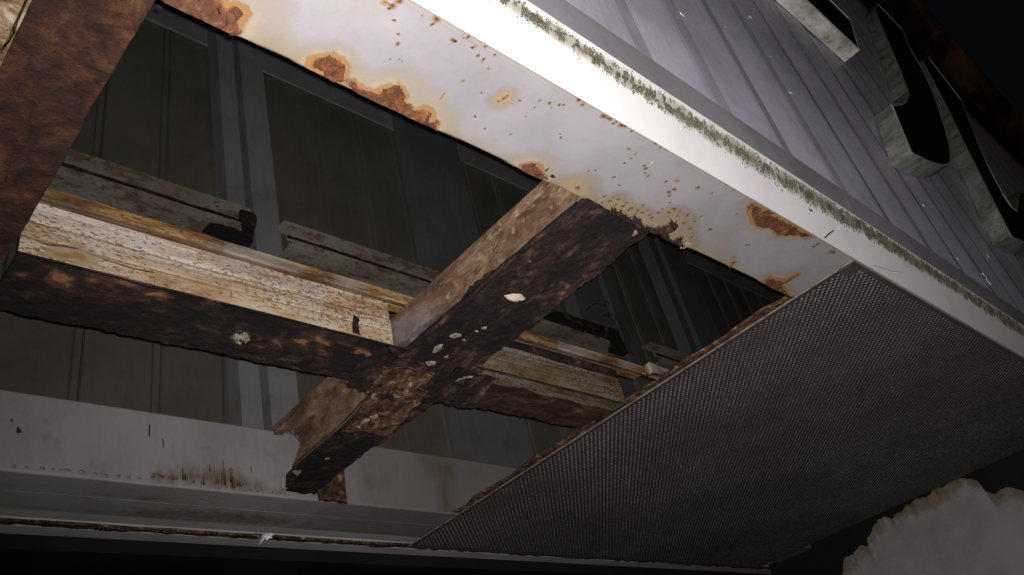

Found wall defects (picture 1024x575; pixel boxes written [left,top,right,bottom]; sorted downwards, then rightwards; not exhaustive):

rust [156,0,274,45]
rust [300,49,446,132]
rust [512,156,597,197]
damp [605,196,693,248]
rust [735,200,836,254]
rust [760,270,804,296]
rust [151,462,281,494]